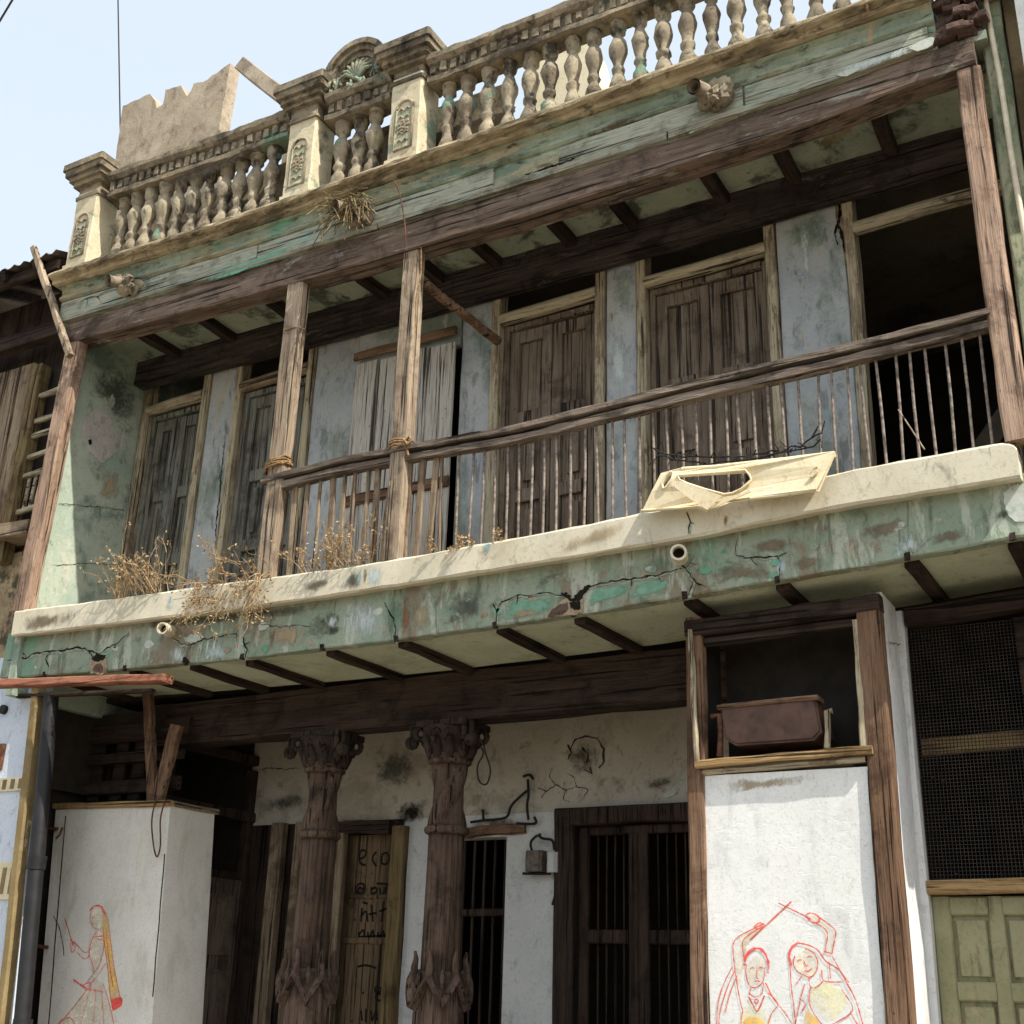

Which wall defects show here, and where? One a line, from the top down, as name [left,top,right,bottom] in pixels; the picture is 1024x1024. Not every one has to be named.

crack [834,204,847,269]
water stain [96,373,131,417]
peeling [82,394,126,480]
crack [735,538,786,578]
crack [493,592,564,624]
peeling [480,566,667,618]
crack [7,632,130,667]
crack [173,624,310,659]
crack [539,769,588,802]